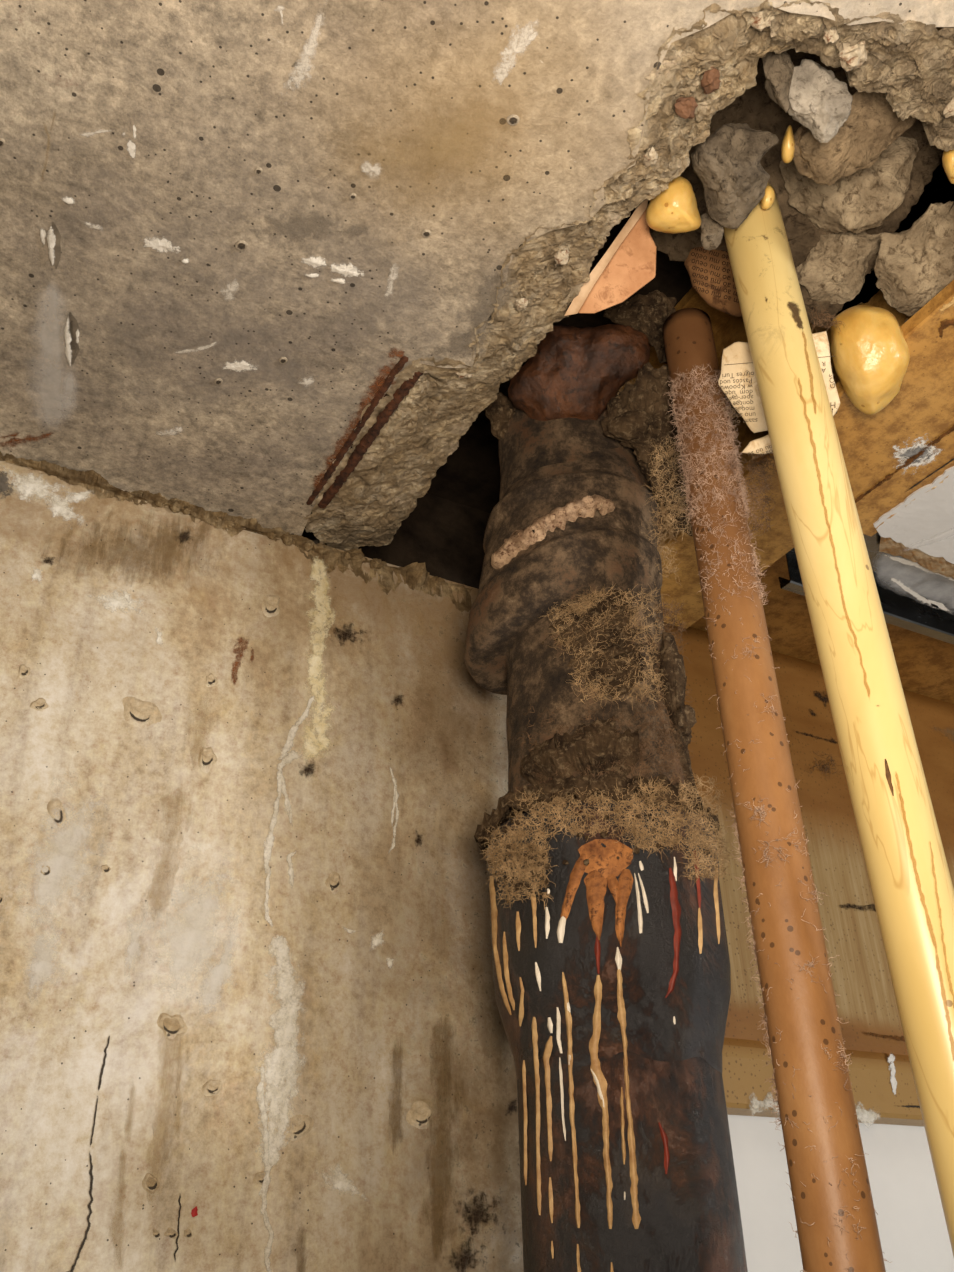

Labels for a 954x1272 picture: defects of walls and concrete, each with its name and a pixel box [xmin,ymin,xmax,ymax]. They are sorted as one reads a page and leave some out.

corrosion [313,349,405,490]
spalling [302,0,954,551]
crack [68,1036,110,1272]
damp [257,558,366,1272]